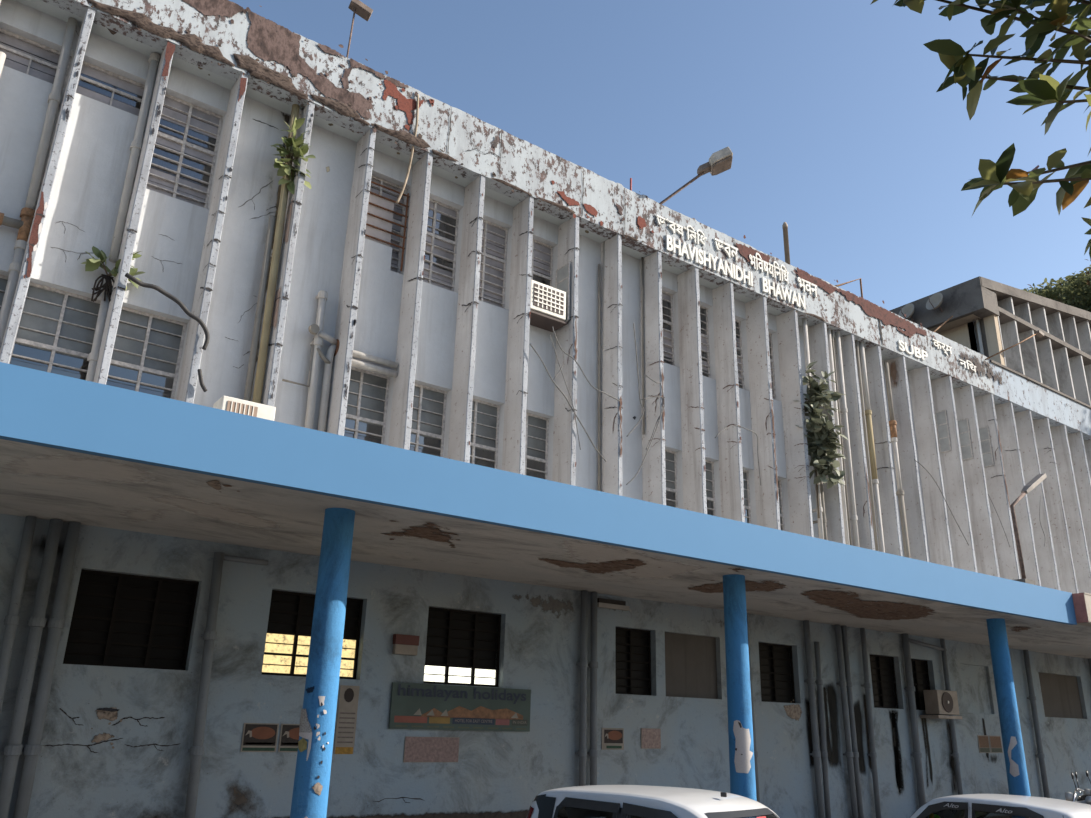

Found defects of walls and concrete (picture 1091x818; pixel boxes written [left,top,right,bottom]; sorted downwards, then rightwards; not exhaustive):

peeling [87,0,463,168]
peeling [491,172,603,231]
peeling [609,192,655,245]
peeling [736,235,772,268]
peeling [793,267,935,338]
spalling [385,520,458,548]
spalling [539,558,661,576]
spalling [728,568,786,592]
spalling [791,588,935,620]
crack [42,708,181,753]
peeling [312,696,329,795]
peeling [733,720,753,773]